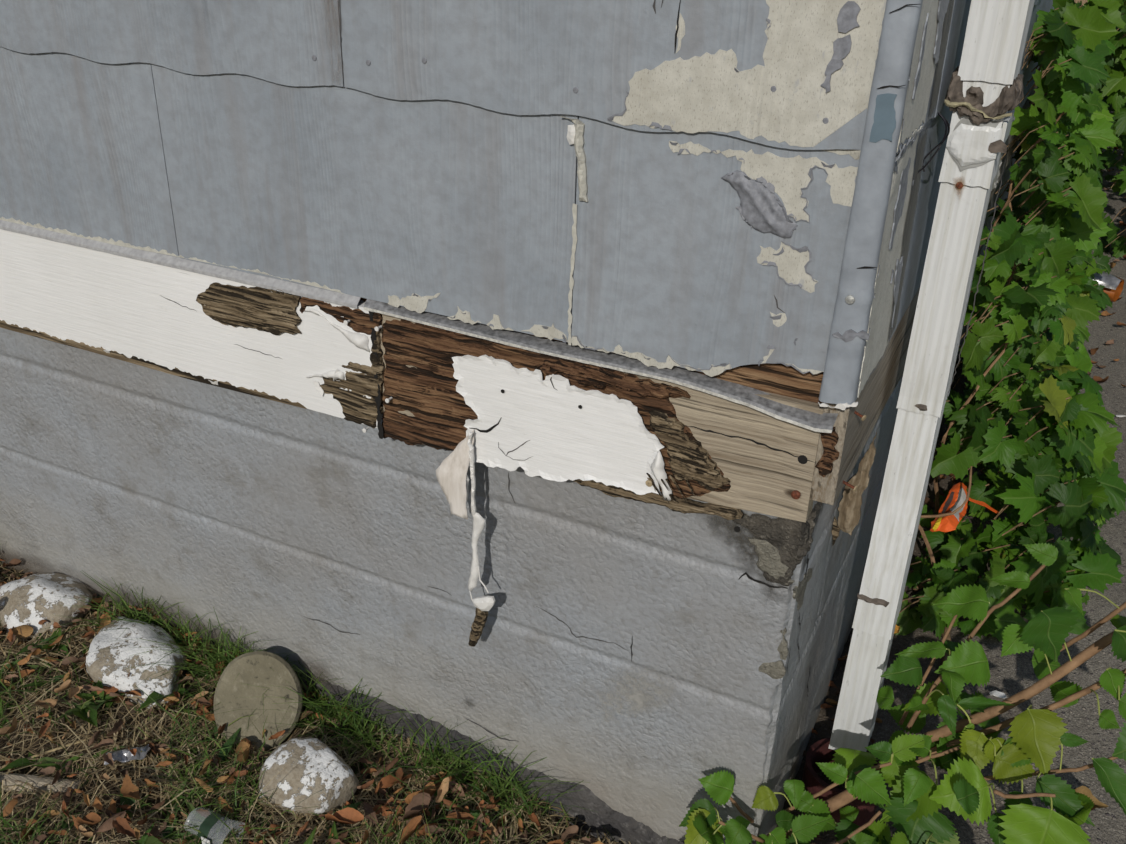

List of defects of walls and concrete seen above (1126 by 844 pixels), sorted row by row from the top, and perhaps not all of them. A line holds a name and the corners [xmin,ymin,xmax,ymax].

peeling [607,0,949,410]
peeling [304,309,370,352]
peeling [388,293,440,313]
peeling [447,306,732,377]
peeling [436,355,672,647]
spalling [732,502,823,611]
spalling [759,627,789,679]
crack [739,555,810,696]